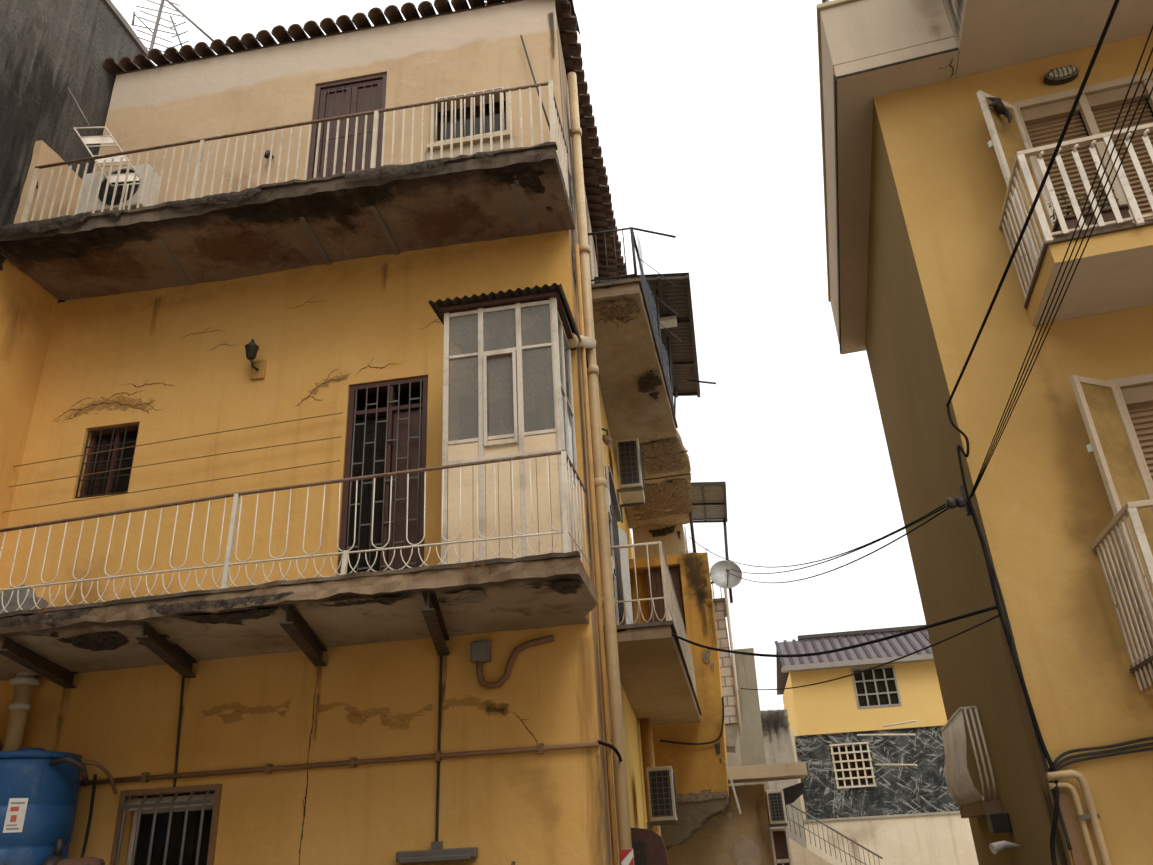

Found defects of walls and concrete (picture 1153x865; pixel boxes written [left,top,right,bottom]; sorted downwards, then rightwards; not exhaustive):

leakage [0,0,63,226]
leakage [220,188,394,233]
leakage [0,227,154,269]
spalling [592,297,640,324]
crack [51,381,174,425]
crack [296,361,401,406]
spalling [637,370,662,401]
spalling [632,439,694,539]
spalling [0,608,143,651]
spalling [147,592,293,625]
leakage [683,553,714,633]
crack [299,667,318,865]